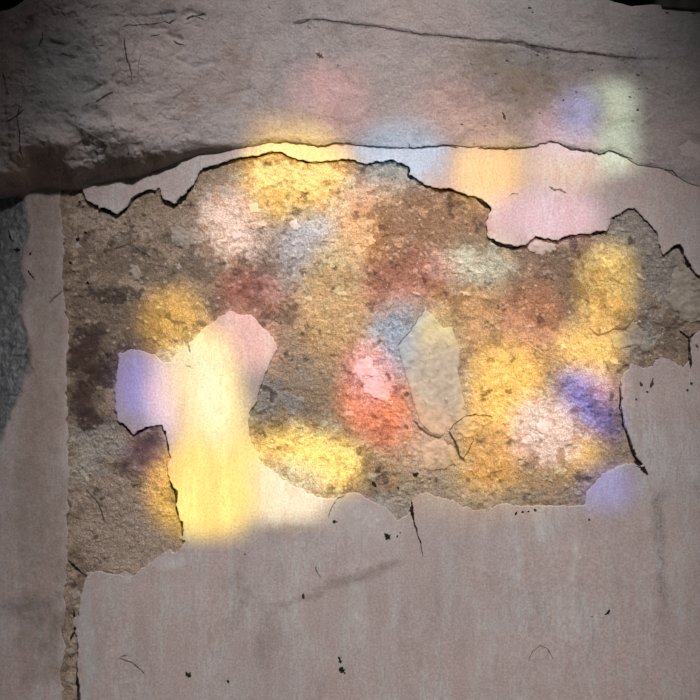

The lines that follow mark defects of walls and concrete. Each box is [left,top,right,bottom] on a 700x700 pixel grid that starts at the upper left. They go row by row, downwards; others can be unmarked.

crack [293,18,636,58]
crack [84,141,656,250]
spalling [60,152,700,700]
crack [414,414,490,460]
crack [619,384,648,475]
crack [409,500,423,555]